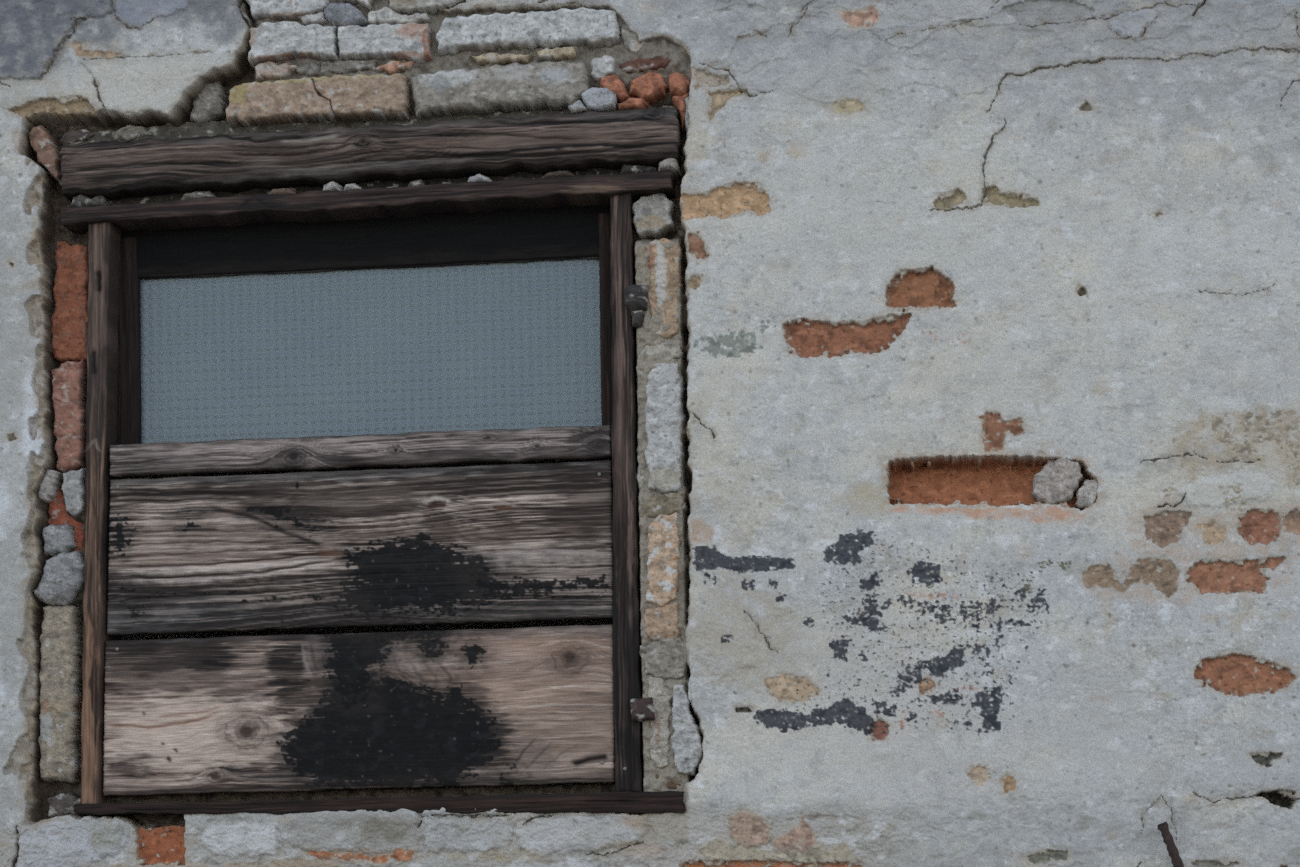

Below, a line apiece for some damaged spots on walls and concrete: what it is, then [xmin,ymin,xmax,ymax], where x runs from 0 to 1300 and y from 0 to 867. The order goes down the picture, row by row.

crack [739,0,816,39]
crack [700,63,775,97]
crack [929,0,1300,212]
spalling [0,0,961,867]
flaking render [753,396,1300,741]
flaking render [1193,727,1300,803]
crack [1138,792,1258,867]